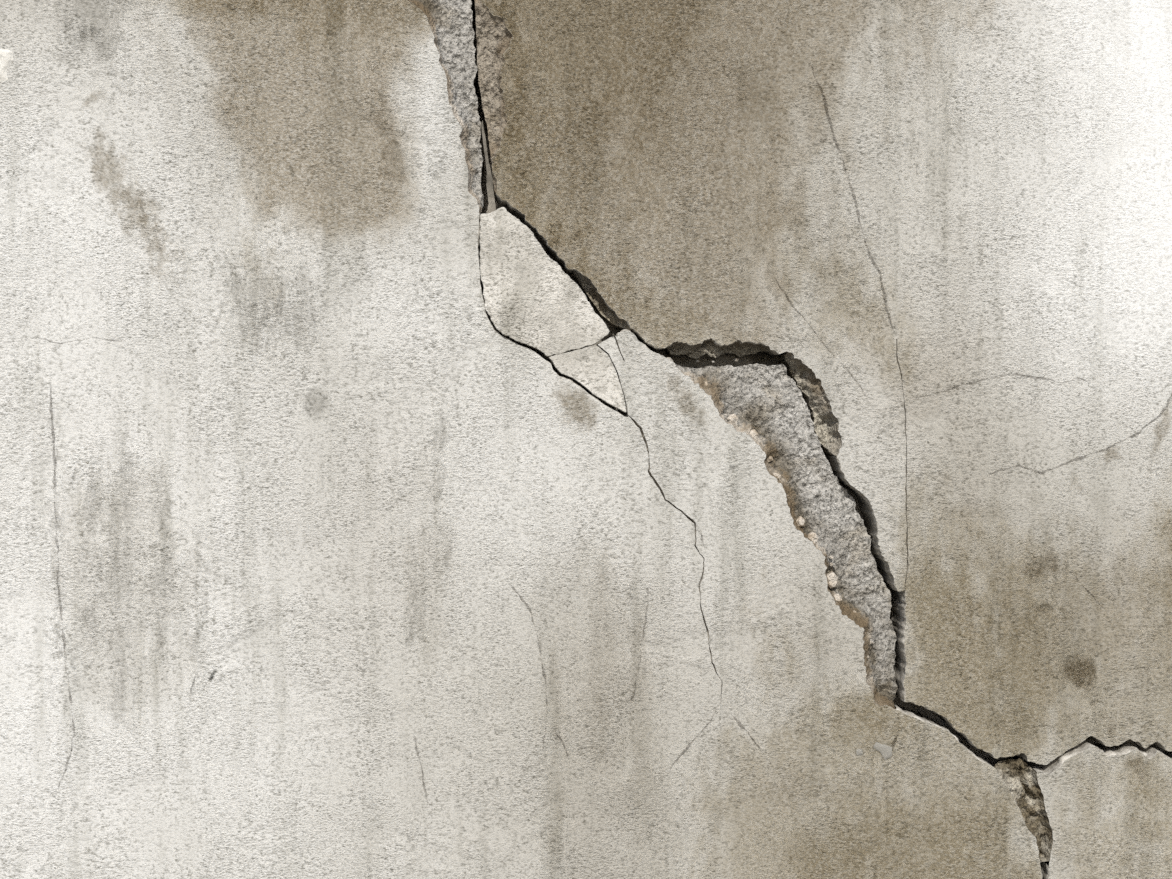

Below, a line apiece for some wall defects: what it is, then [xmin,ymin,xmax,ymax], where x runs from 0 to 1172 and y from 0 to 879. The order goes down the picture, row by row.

flaking render [407,0,513,214]
crack [472,0,788,694]
flaking render [675,352,898,709]
crack [825,339,1172,774]
crack [1040,862,1050,879]